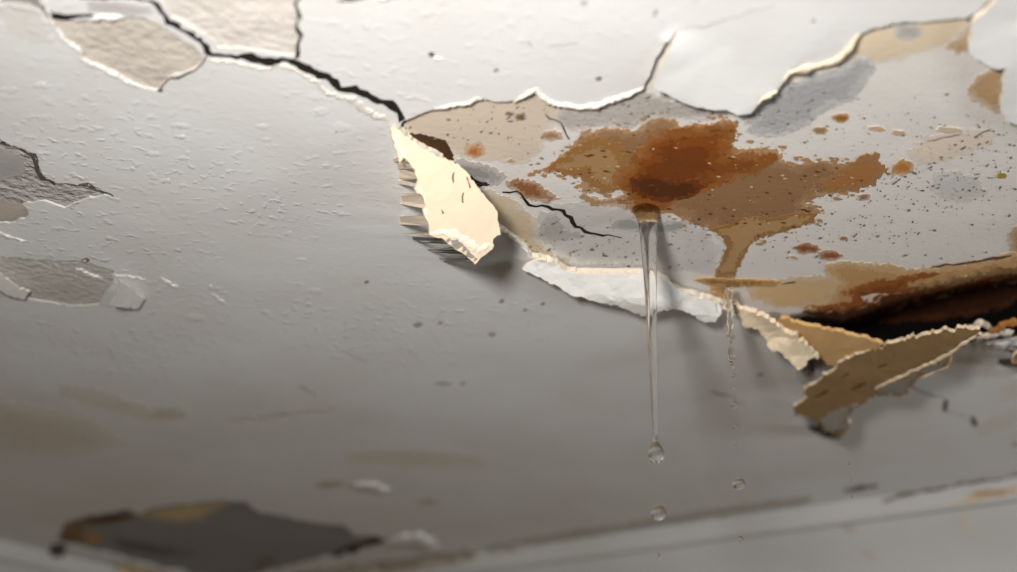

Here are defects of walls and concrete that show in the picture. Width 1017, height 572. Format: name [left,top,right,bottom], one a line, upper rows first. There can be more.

crack [30,1,94,20]
spalling [161,0,299,54]
crack [139,0,407,129]
spalling [0,141,105,206]
damp [404,18,970,323]
spalling [389,36,1017,439]
spalling [0,256,145,309]
spalling [49,543,67,558]
spalling [63,501,386,572]